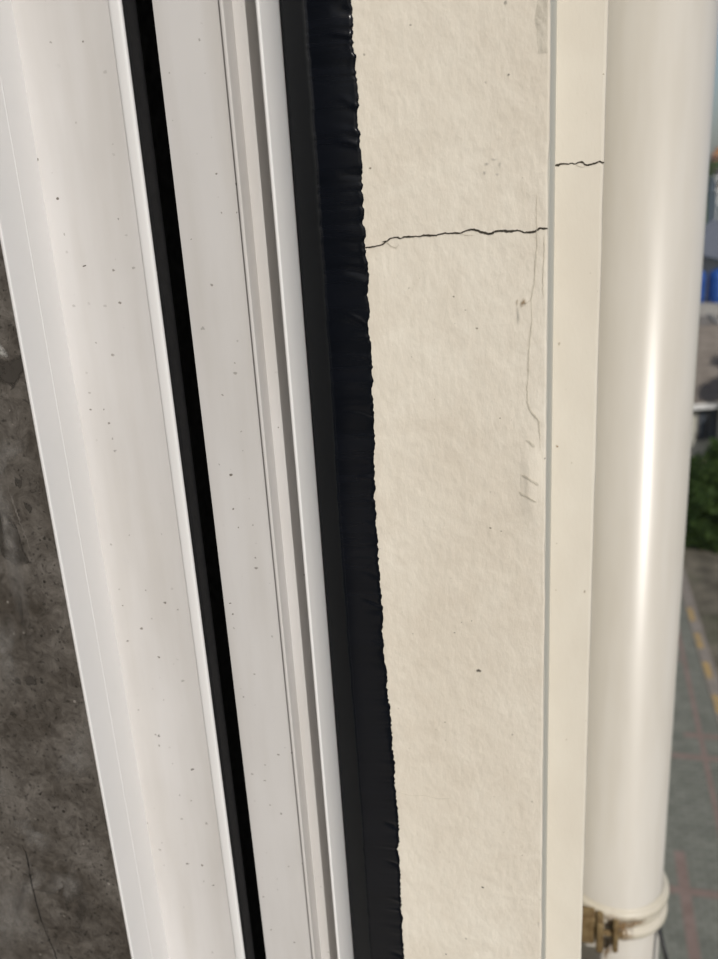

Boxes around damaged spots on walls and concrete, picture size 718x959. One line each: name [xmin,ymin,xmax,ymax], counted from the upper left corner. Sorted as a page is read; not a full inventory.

crack [555,160,604,168]
crack [364,194,548,438]